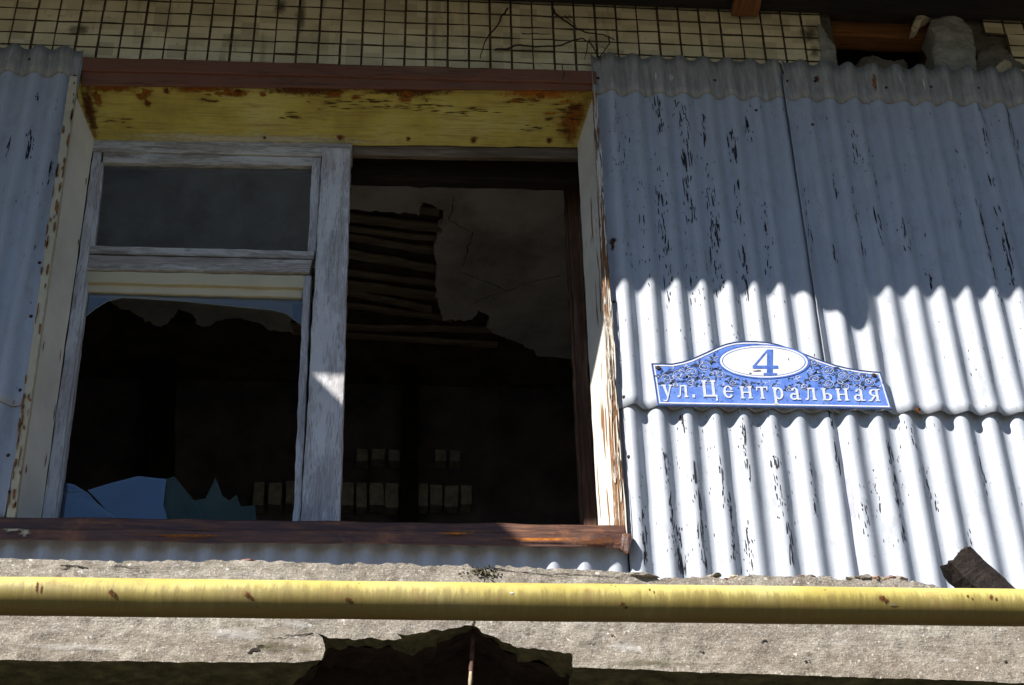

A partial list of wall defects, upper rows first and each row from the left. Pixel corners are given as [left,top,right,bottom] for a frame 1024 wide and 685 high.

corrosion [82,86,247,137]
corrosion [260,83,452,102]
peeling [727,105,761,163]
peeling [626,96,725,311]
peeling [734,179,755,303]
peeling [975,198,1015,312]
peeling [552,91,660,579]
peeling [660,411,755,578]
peeling [730,407,779,480]
peeling [770,451,796,566]
peeling [883,421,917,546]
spalling [293,625,585,685]